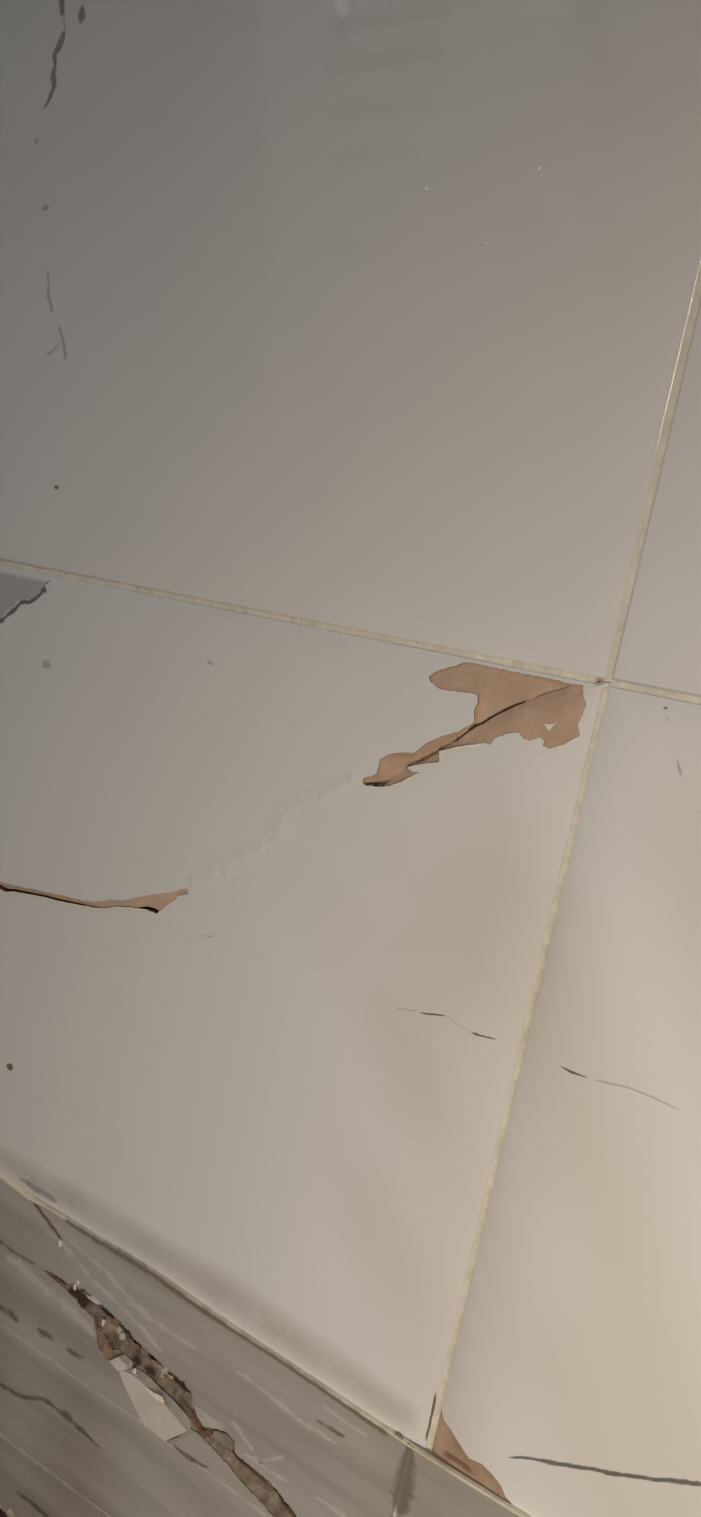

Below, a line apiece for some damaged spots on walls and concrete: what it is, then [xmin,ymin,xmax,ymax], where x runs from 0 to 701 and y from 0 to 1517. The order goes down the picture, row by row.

spalling [363,662,611,789]
crack [0,769,363,984]
spalling [426,1396,512,1504]